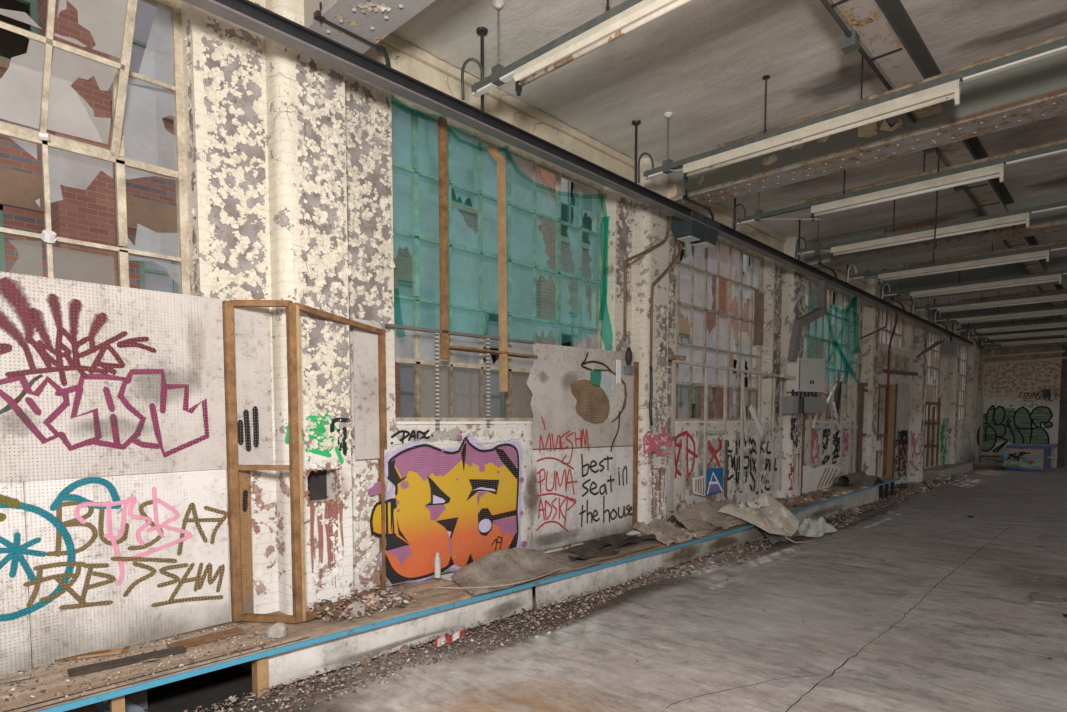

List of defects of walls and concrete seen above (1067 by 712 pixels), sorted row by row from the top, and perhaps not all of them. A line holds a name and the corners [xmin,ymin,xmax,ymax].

peeling [353,1,392,13]
peeling [185,13,275,448]
peeling [288,54,395,598]
peeling [615,327,632,352]
peeling [615,195,633,303]
peeling [646,226,806,519]